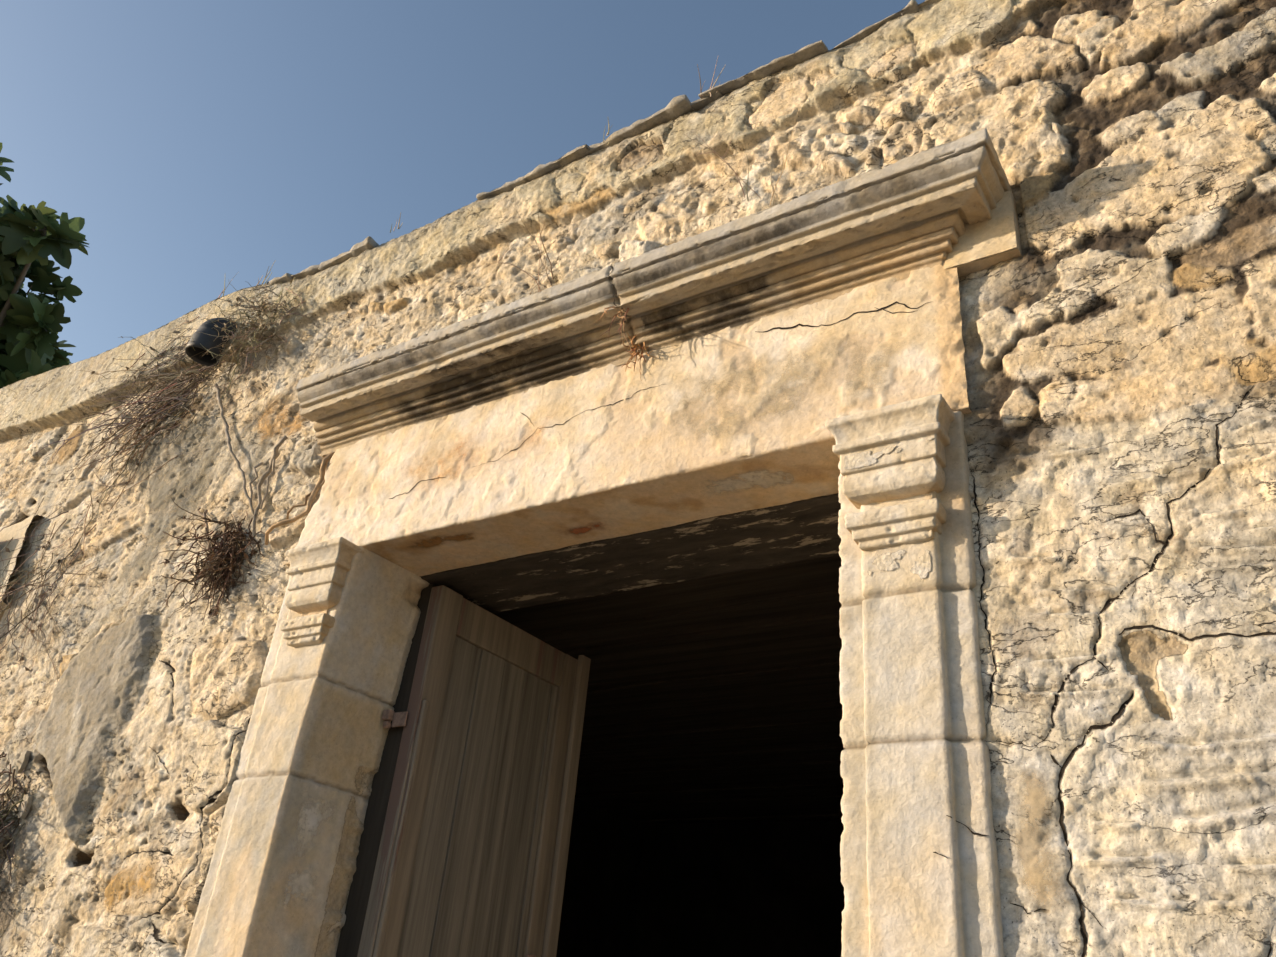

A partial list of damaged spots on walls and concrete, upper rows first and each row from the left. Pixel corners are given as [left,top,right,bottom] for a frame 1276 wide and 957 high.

leakage [722,220,802,257]
leakage [620,269,680,291]
leakage [644,276,767,341]
crack [755,301,933,332]
leakage [342,341,590,420]
leakage [678,352,813,435]
crack [971,385,1276,957]
spalling [1118,630,1188,721]